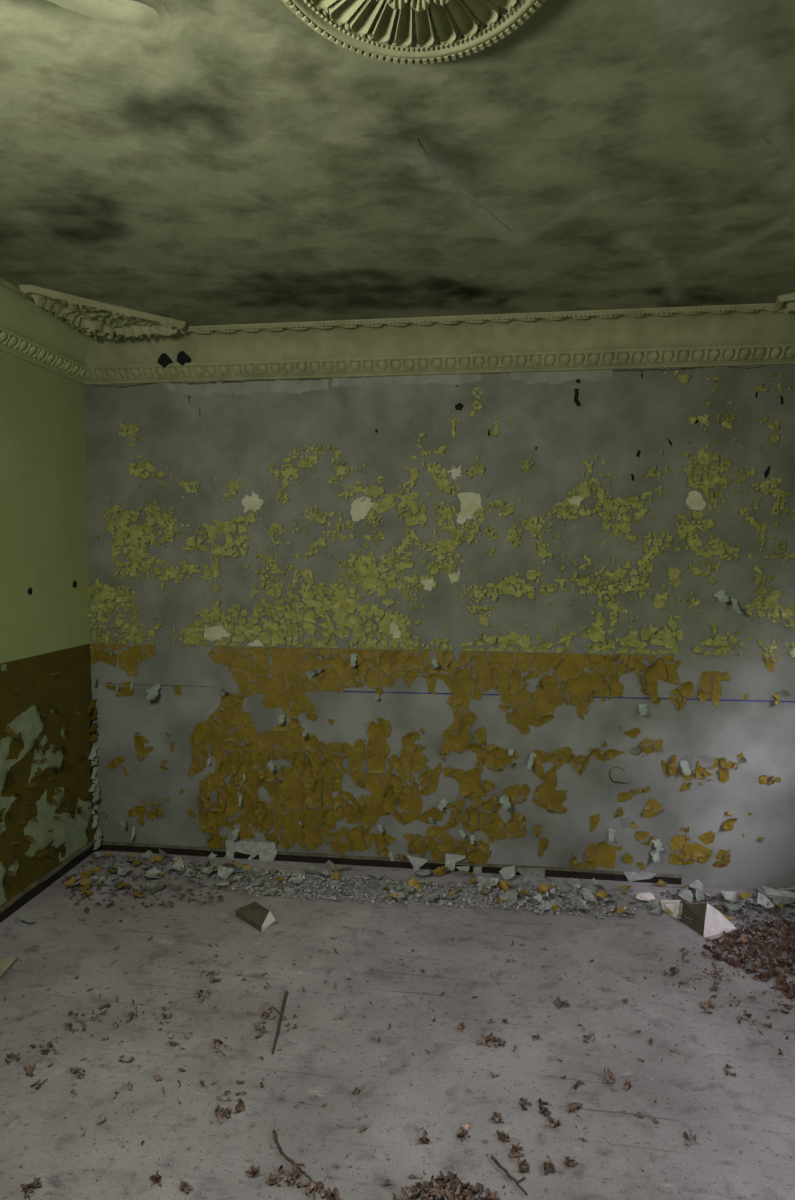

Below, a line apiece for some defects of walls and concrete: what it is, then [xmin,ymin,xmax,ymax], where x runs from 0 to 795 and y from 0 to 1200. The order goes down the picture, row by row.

peeling [0,374,795,906]